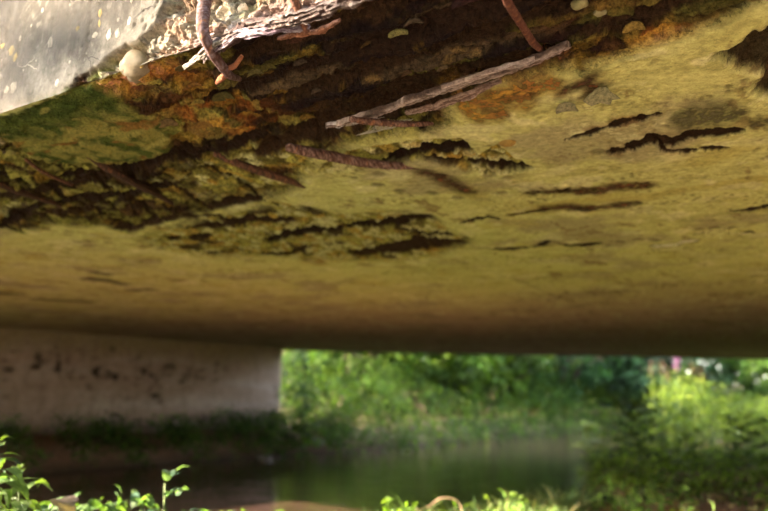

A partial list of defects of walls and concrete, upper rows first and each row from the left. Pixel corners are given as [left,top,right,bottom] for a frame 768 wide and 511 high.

spalling [0,0,768,234]
corrosion [450,43,607,123]
crack [562,111,746,157]
corrosion [415,169,477,193]